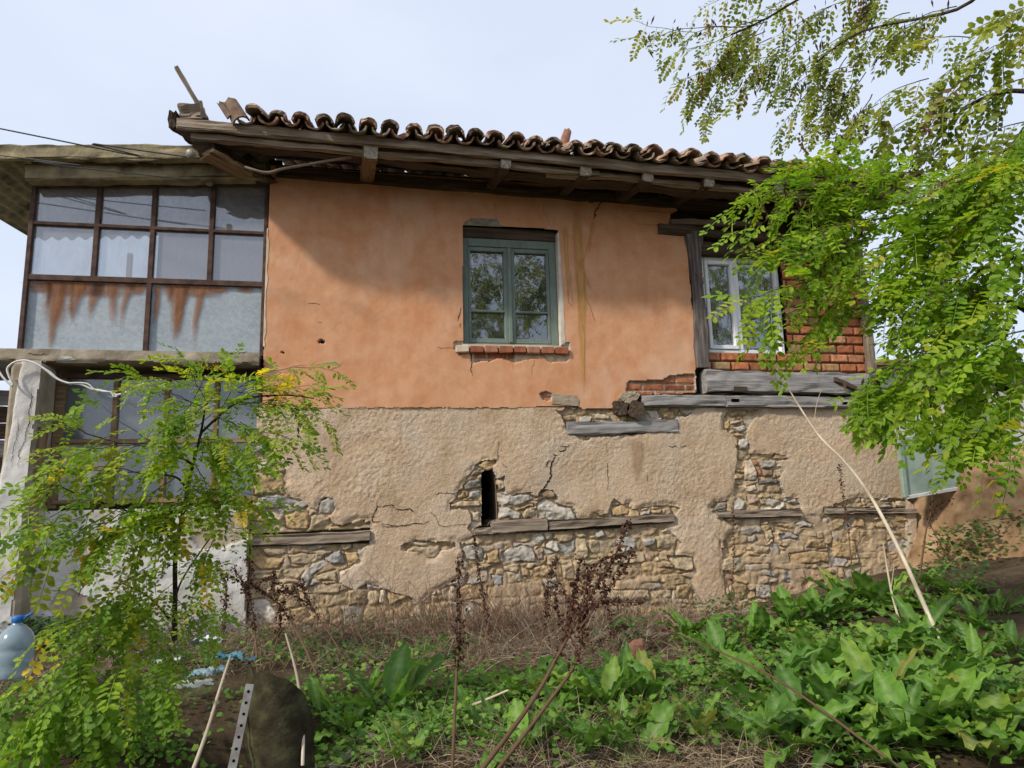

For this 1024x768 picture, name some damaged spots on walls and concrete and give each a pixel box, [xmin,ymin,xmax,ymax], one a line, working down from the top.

rust [29,281,226,340]
spalling [454,233,571,363]
damp [564,224,594,382]
crack [372,493,466,528]
spalling [191,436,710,635]
crack [541,446,568,491]
spalling [540,373,696,440]
spalling [711,408,908,606]